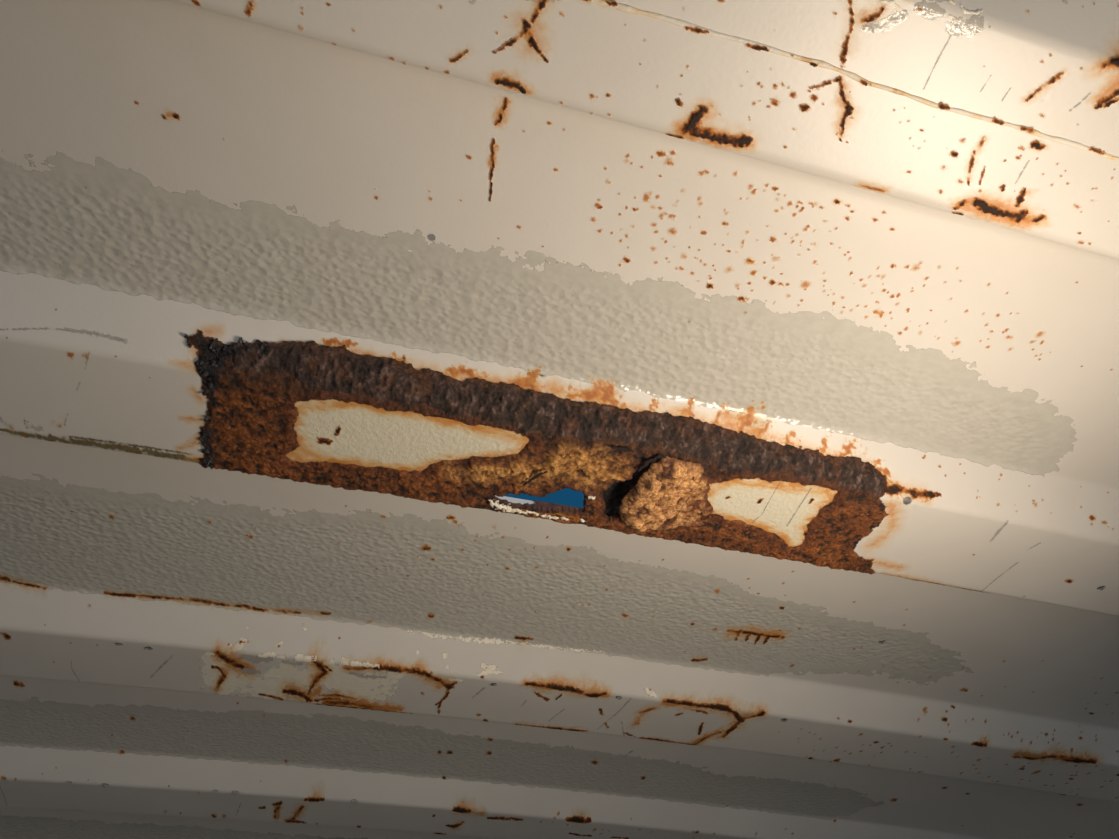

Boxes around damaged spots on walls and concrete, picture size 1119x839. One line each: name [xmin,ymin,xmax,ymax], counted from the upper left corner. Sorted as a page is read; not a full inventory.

corrosion [1094,55,1119,109]
corrosion [641,98,753,177]
corrosion [619,194,731,289]
corrosion [740,184,854,229]
corrosion [943,138,1047,226]
corrosion [179,329,987,610]
peeling [197,619,406,708]
peeling [407,630,607,682]
corrosion [713,628,785,651]
corrosion [624,707,697,745]
corrosion [1006,729,1097,806]